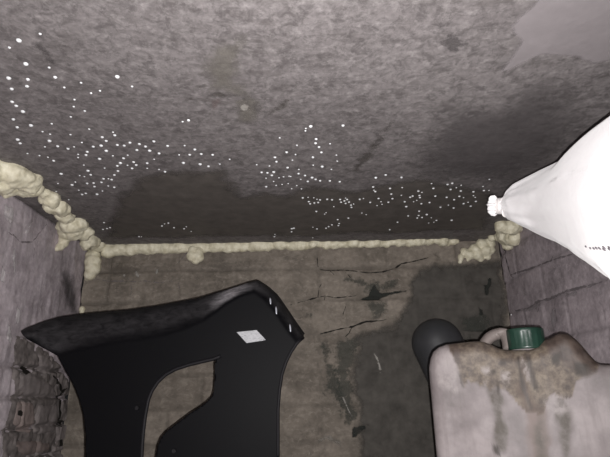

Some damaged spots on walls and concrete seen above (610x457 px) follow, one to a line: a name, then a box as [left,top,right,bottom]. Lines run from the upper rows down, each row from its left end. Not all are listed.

water stain [109,171,490,237]
crack [317,258,427,277]
crack [502,249,572,277]
crack [291,285,387,337]
crack [516,280,607,321]
water stain [322,338,359,424]